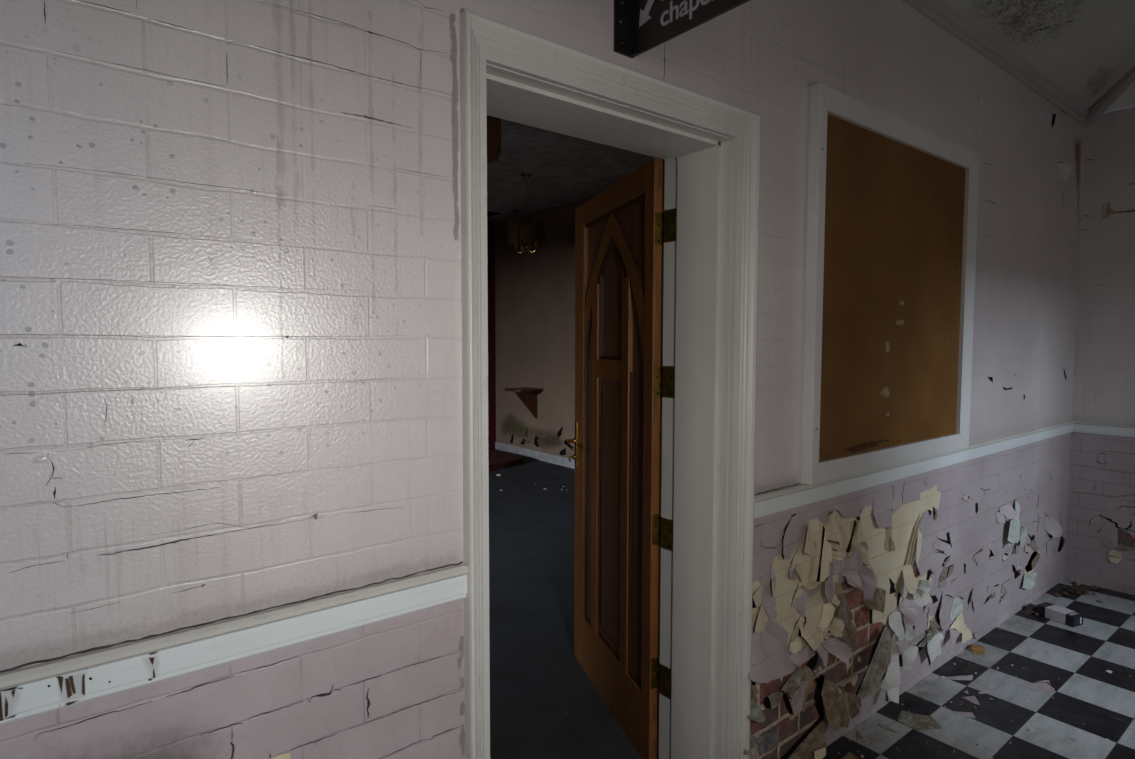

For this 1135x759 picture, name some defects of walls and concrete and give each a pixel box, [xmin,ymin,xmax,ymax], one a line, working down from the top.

peeling [985,496,1066,603]
peeling [744,484,976,759]
peeling [952,690,988,718]
peeling [1017,680,1054,692]